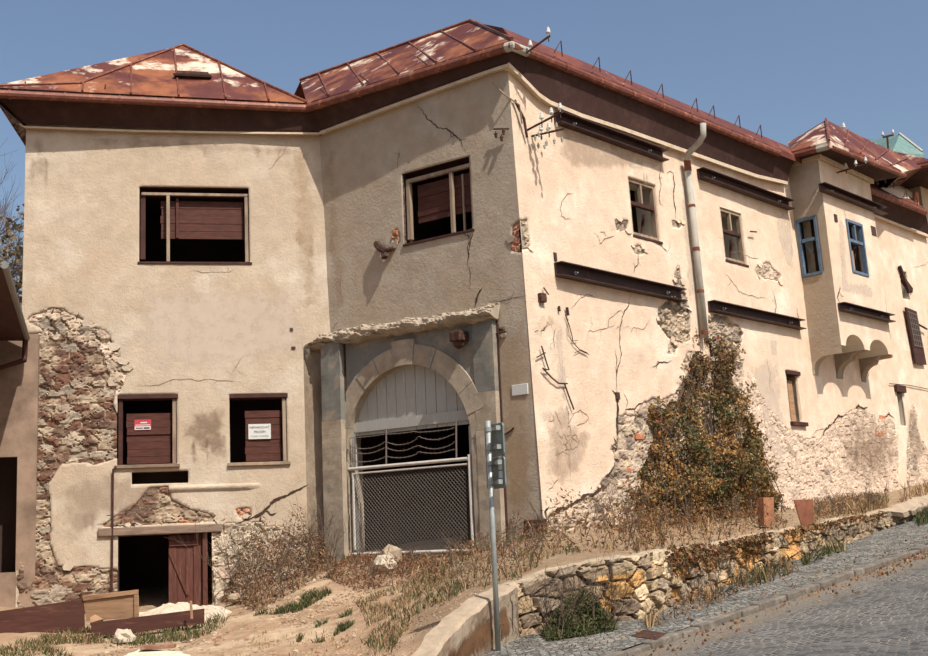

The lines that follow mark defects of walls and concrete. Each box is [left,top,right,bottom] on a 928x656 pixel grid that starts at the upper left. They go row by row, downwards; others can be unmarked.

crack [418,107,466,152]
spalling [506,219,534,253]
spalling [755,261,783,286]
crack [145,355,246,386]
crack [544,295,649,519]
spalling [547,265,928,533]
spalling [17,307,134,612]
crack [236,484,309,525]
spalling [103,487,309,605]